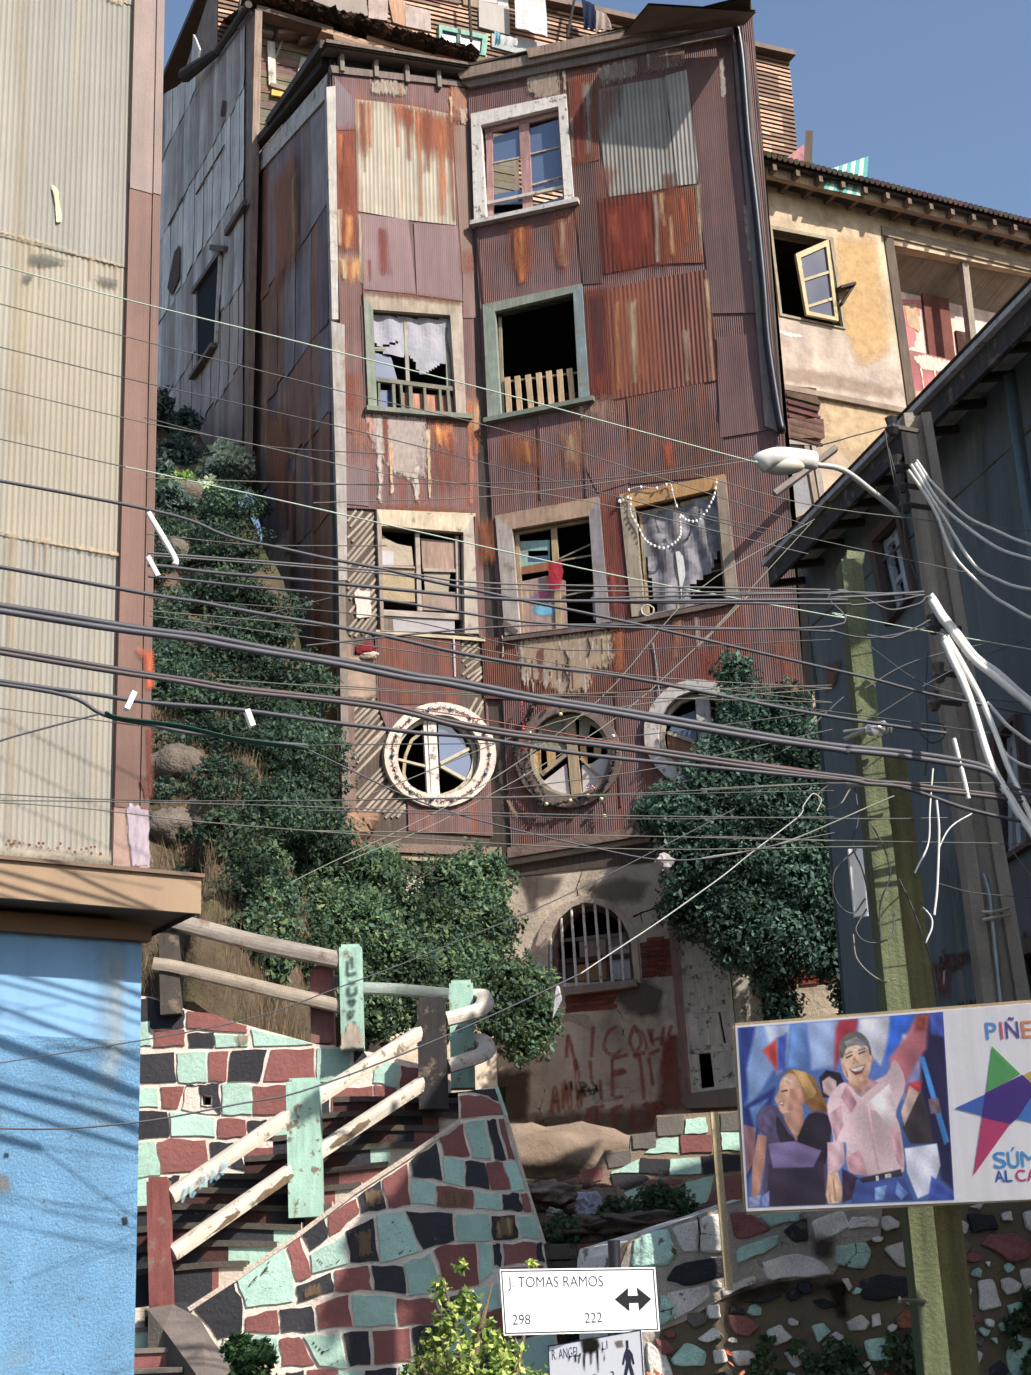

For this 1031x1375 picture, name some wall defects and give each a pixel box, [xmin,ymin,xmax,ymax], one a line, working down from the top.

rust [396,103,455,215]
rust [272,154,298,285]
rust [514,226,530,280]
rust [602,170,701,267]
peeling [837,239,889,361]
peeling [902,299,950,388]
peeling [366,413,432,503]
rust [383,403,494,559]
peeling [517,629,614,694]
damp [617,980,662,1016]
spalling [640,936,673,978]